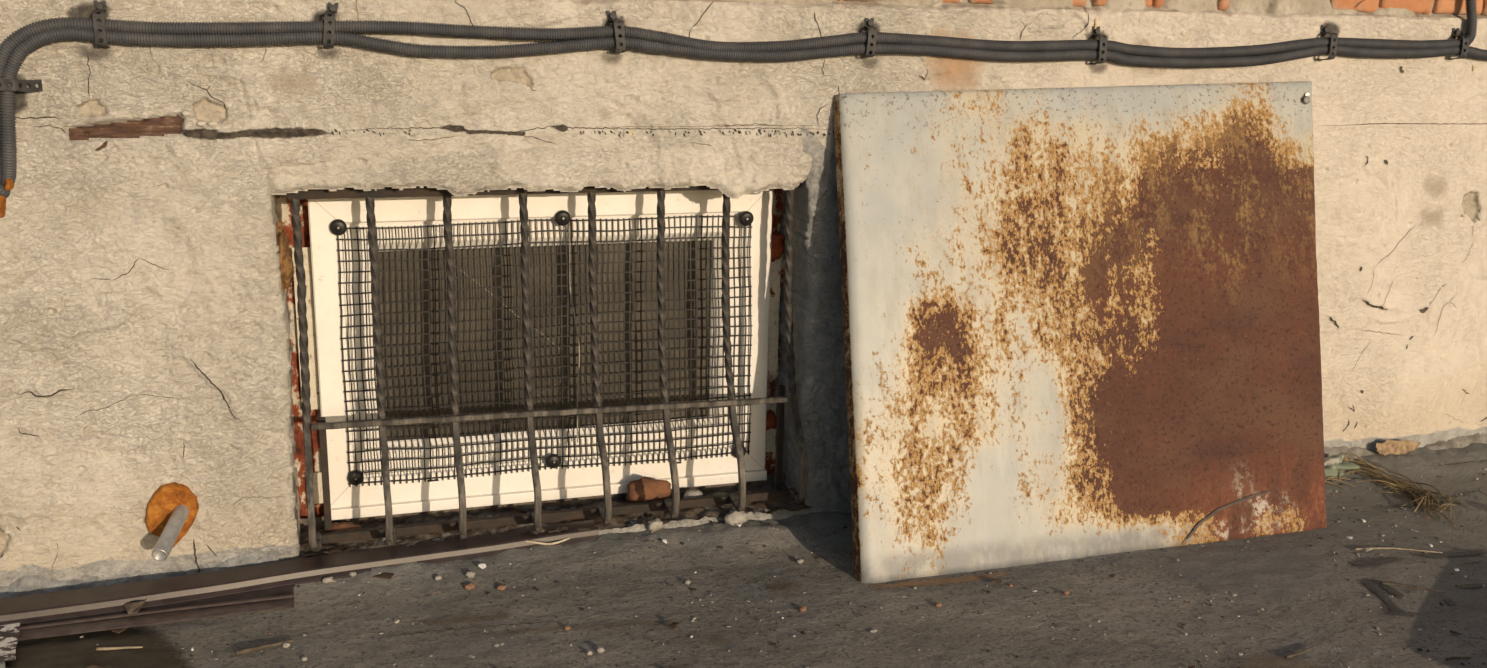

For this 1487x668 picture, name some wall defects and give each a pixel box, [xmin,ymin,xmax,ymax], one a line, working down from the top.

crack [517,12,840,146]
spalling [69,114,384,150]
crack [340,127,469,141]
spalling [675,129,835,137]
crack [1331,120,1487,128]
leakage [5,627,189,668]